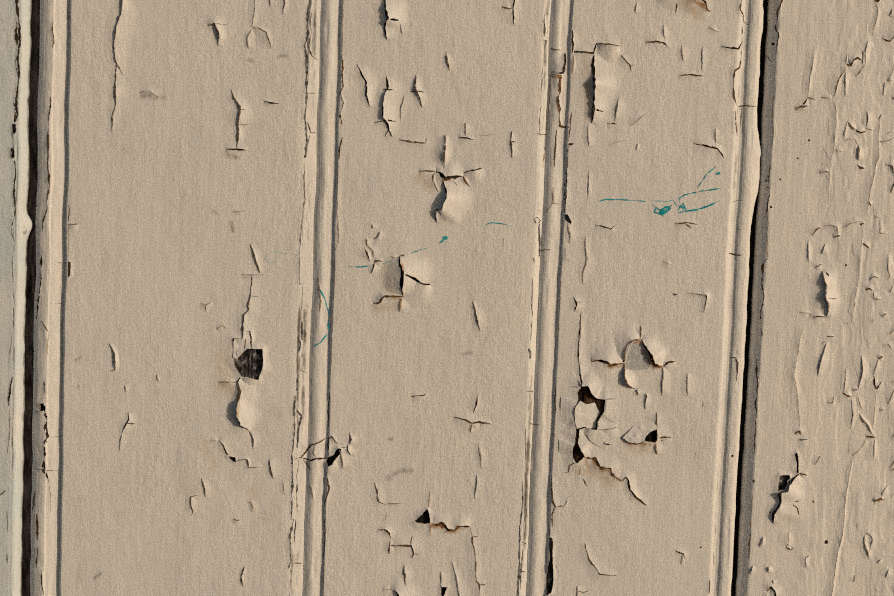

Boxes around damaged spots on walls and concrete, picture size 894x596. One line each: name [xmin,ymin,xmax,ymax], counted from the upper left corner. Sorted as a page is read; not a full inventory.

crack [105,0,160,133]
peeling [374,73,411,141]
peeling [653,0,756,159]
peeling [418,132,486,227]
peeling [358,223,436,314]
peeling [765,0,894,596]
peeling [211,341,282,479]
peeling [295,432,359,499]
peeling [559,321,697,508]
peeling [730,355,741,381]
peeling [370,481,487,596]
peeling [747,565,787,596]